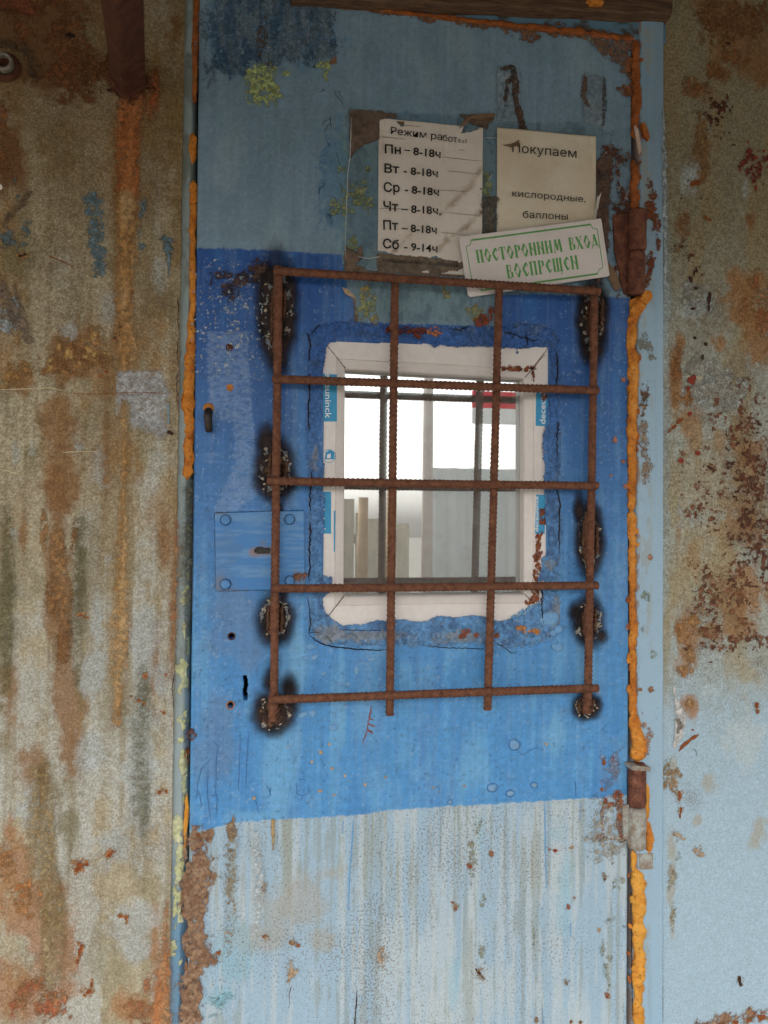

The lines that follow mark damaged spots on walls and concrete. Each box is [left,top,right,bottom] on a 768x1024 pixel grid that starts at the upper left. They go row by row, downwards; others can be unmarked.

peeling [190,0,343,108]
rust [644,179,662,288]
rust [0,68,161,727]
rust [667,343,694,434]
rust [164,520,180,679]
rust [525,508,546,605]
crack [555,490,563,554]
rust [673,613,703,677]
rust [71,857,89,875]
rust [122,814,240,1024]
rust [548,747,627,883]
rust [1,974,95,1023]